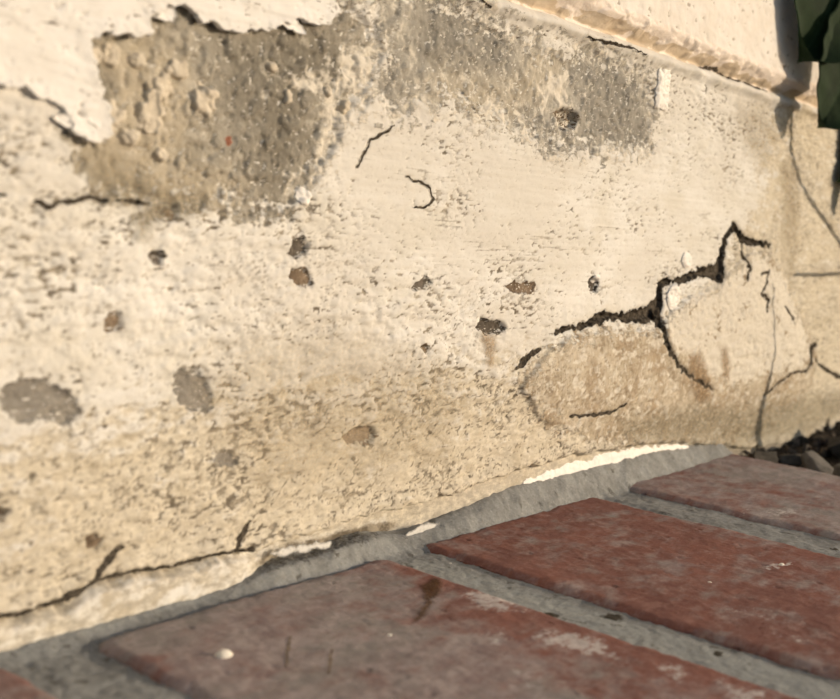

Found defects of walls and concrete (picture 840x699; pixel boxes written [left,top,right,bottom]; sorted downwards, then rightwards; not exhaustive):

spalling [0,0,660,228]
crack [356,125,395,168]
crack [406,175,435,209]
crack [515,221,796,391]
crack [763,342,840,397]
peeling [0,378,83,426]
crack [0,520,254,617]